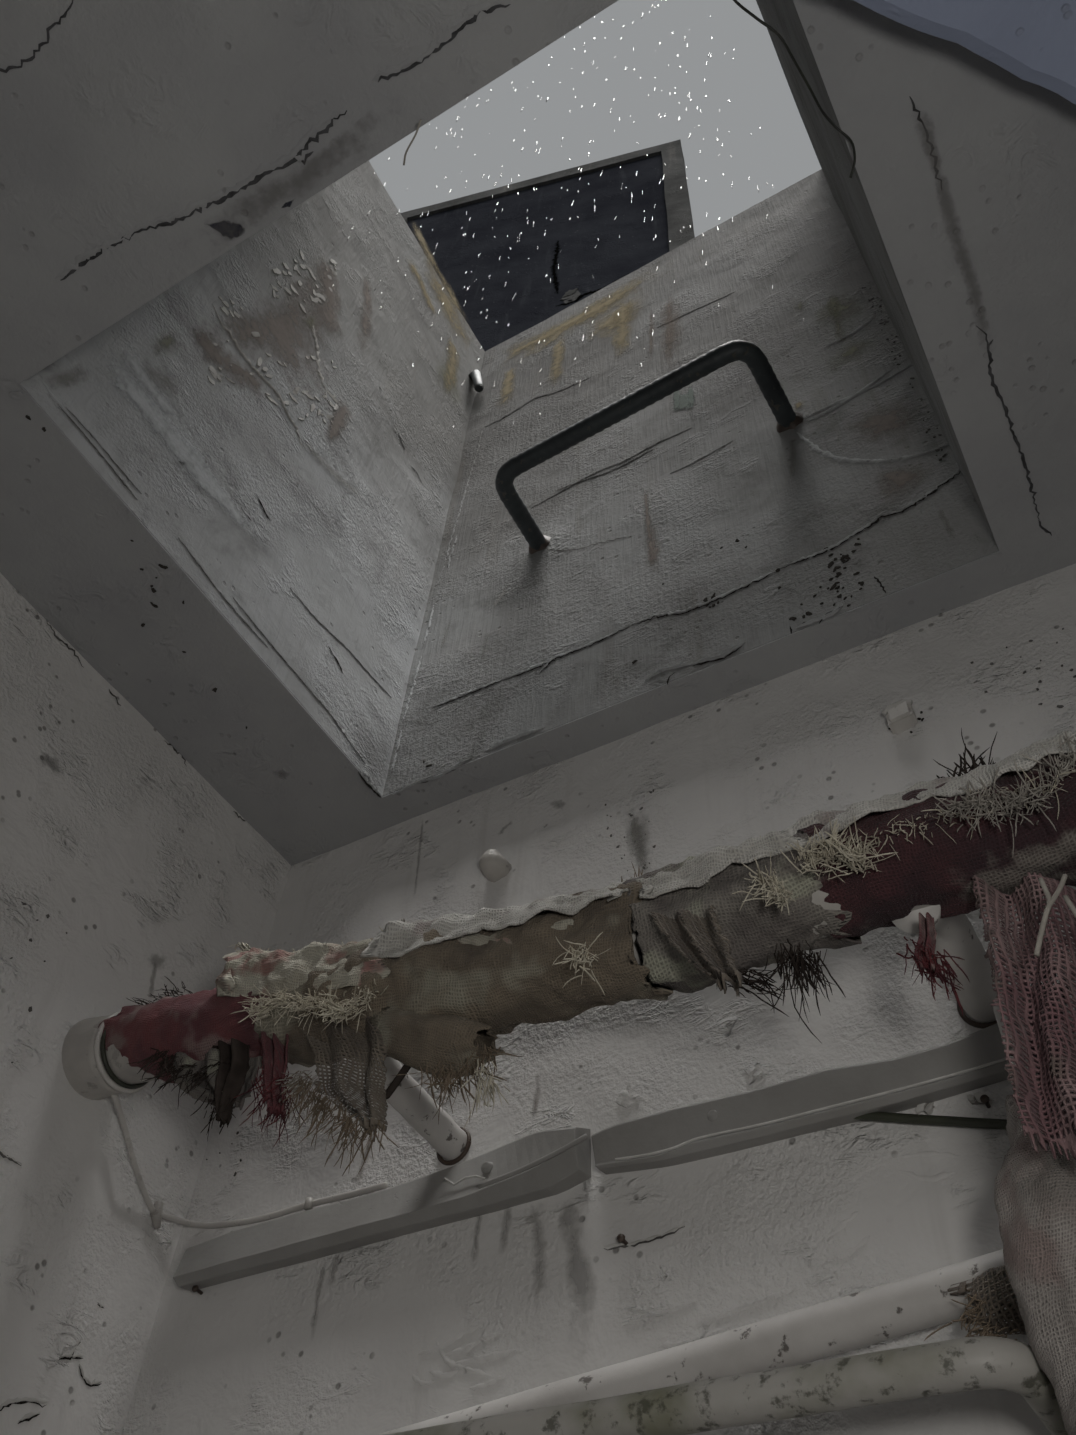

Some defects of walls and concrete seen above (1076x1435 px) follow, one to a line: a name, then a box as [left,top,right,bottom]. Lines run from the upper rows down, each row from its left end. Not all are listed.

crack [0,0,73,73]
crack [372,0,510,82]
crack [909,96,942,190]
crack [55,109,347,281]
leakage [210,221,244,239]
rust [502,283,633,402]
crack [57,403,142,500]
crack [976,326,1052,536]
crack [179,426,961,797]